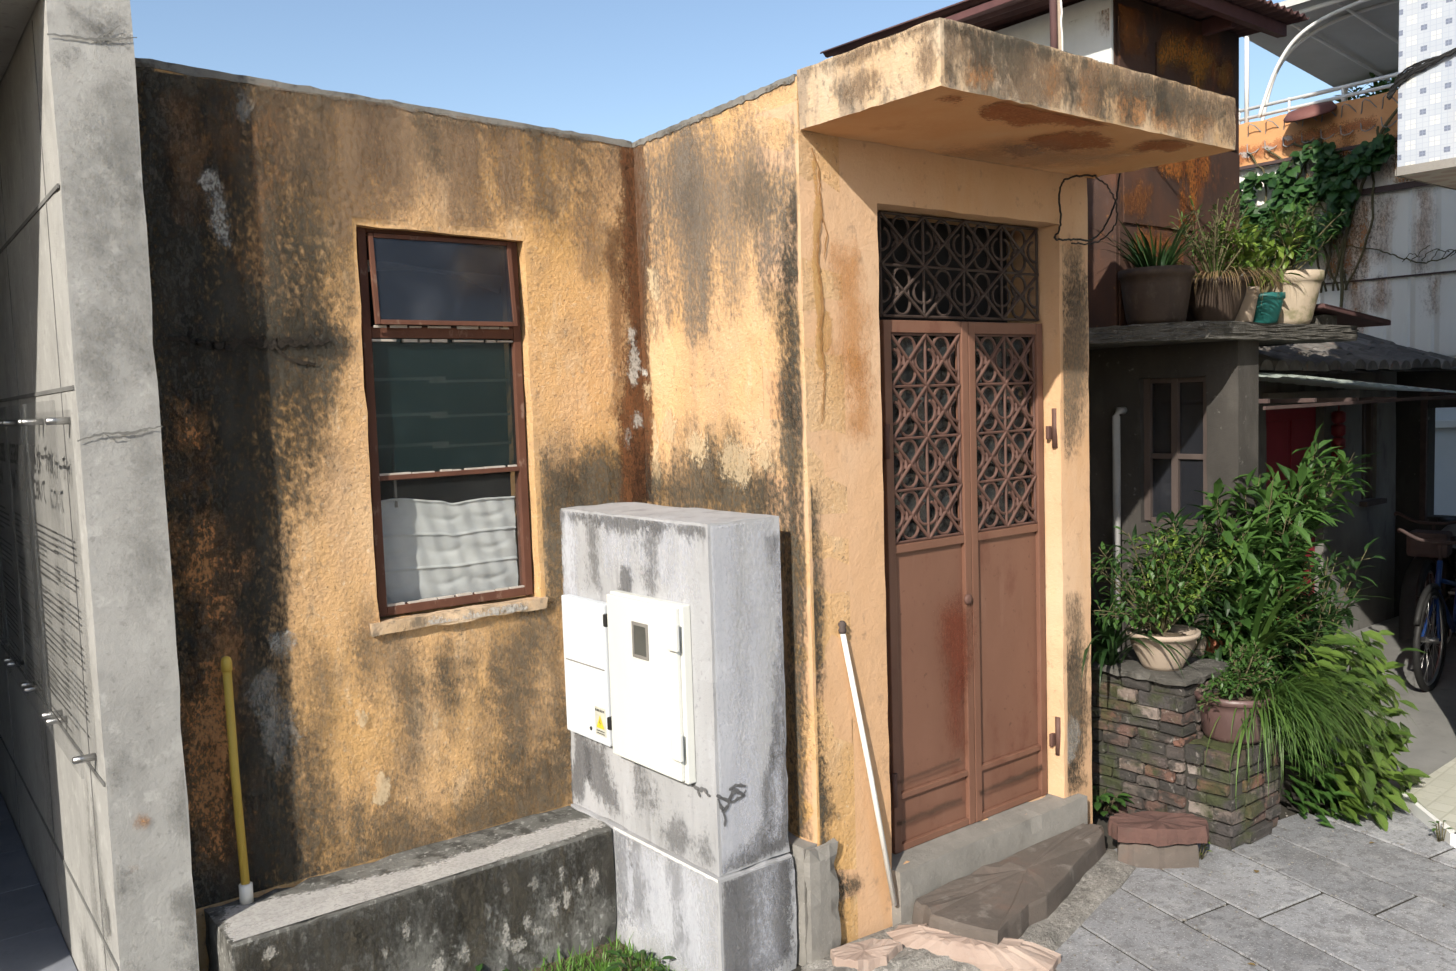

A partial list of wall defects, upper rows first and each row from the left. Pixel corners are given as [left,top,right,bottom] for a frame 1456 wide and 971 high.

water stain [800,19,1236,142]
rust [1101,3,1233,92]
peeling [199,171,231,246]
rust [1135,156,1210,256]
rust [615,145,656,503]
peeling [647,267,660,301]
water stain [1063,249,1089,455]
water stain [135,61,836,971]
water stain [837,872,861,918]